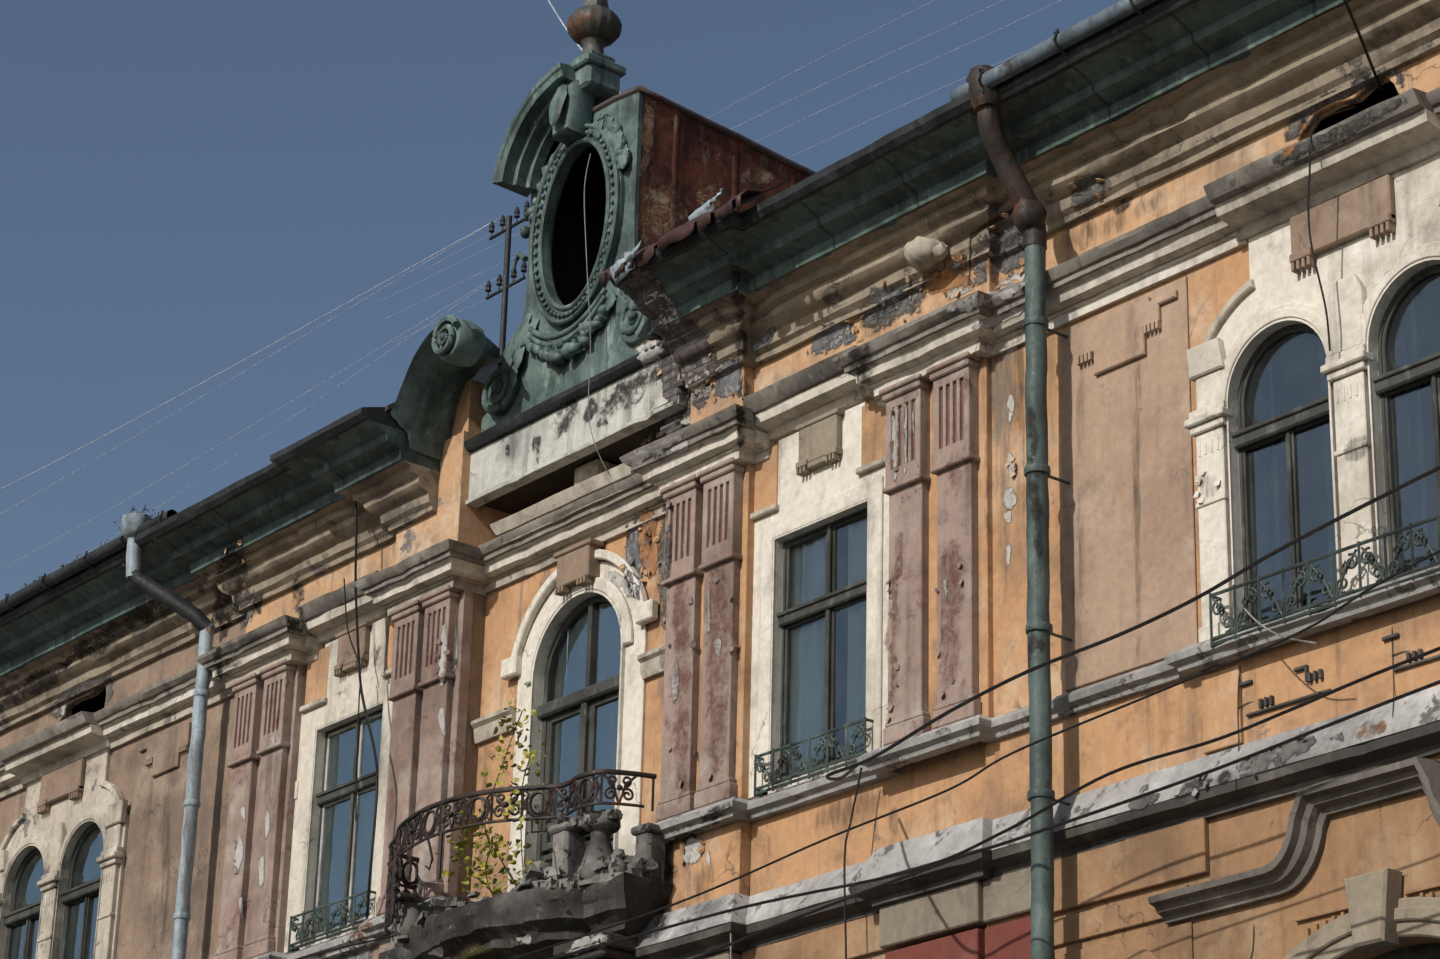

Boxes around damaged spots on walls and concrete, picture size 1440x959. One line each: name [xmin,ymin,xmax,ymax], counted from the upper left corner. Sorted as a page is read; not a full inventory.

corrosion [742,165,773,184]
peeling [1068,173,1133,214]
flaking render [807,213,1031,356]
flaking render [628,280,775,468]
spalling [206,540,263,679]
flaking render [608,495,739,780]
peeling [885,533,902,687]
peeling [934,551,963,698]
flaking render [315,939,372,959]